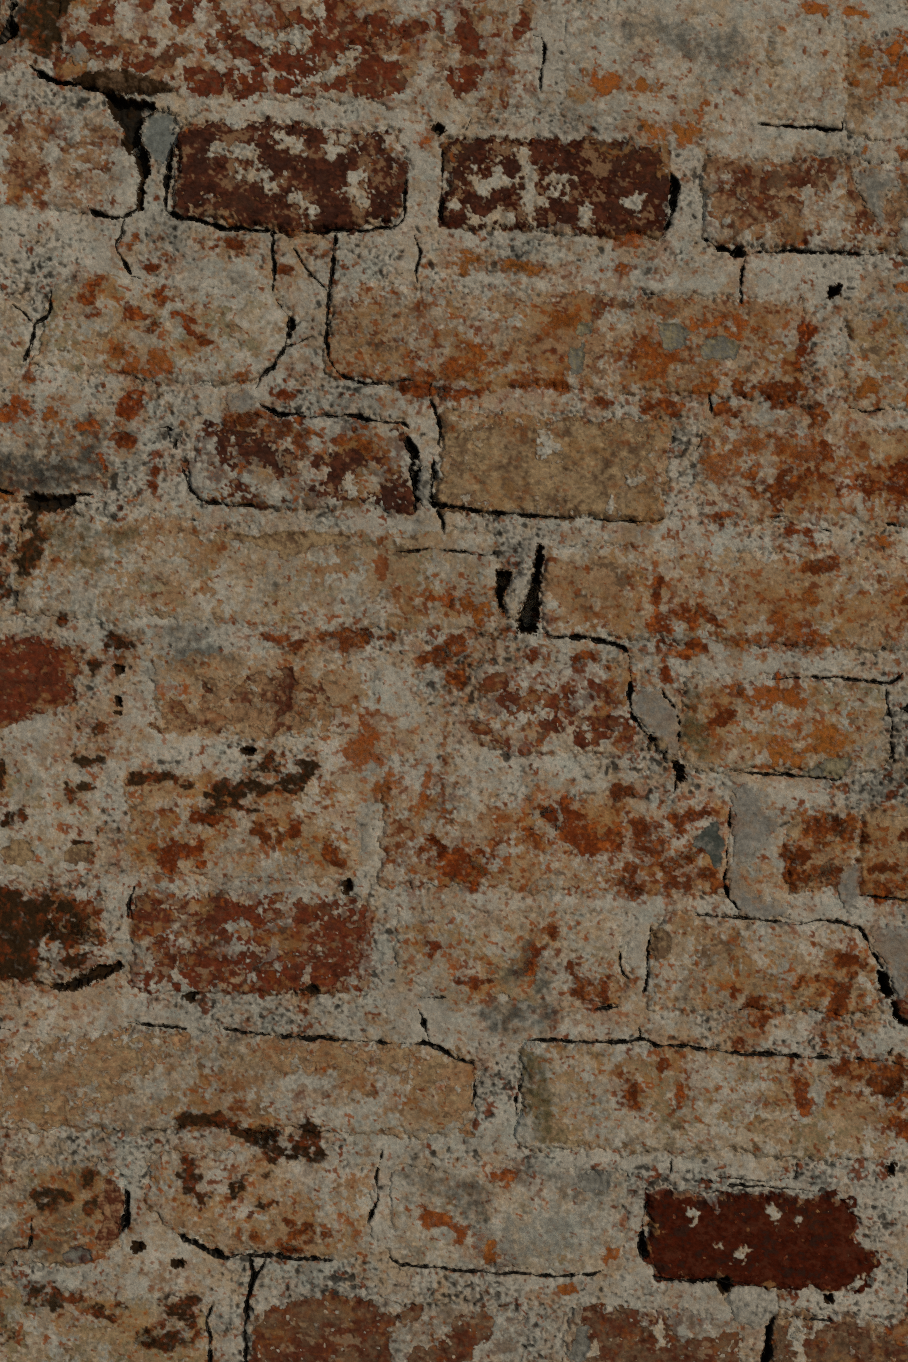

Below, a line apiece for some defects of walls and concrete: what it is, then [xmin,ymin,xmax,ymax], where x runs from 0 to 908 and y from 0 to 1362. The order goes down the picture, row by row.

crack [13,293,52,362]
crack [90,117,660,556]
crack [733,771,843,781]
crack [695,809,908,969]
crack [531,928,908,1067]
crack [670,1159,815,1192]